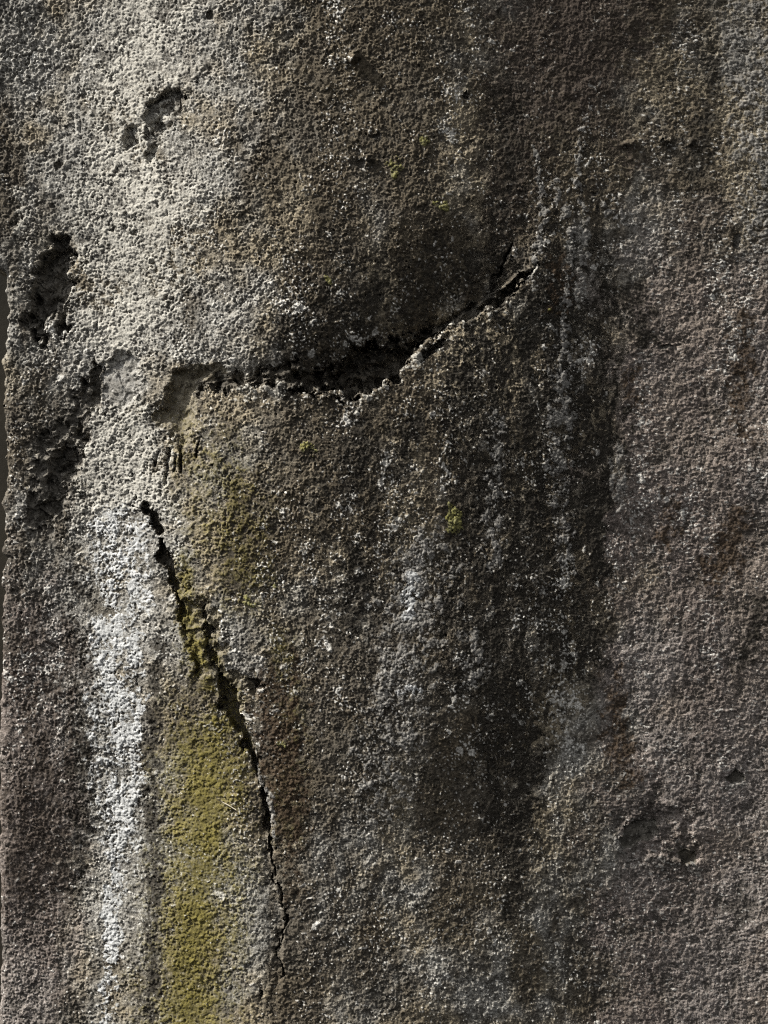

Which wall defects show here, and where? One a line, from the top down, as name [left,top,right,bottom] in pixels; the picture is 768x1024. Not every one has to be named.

spalling [18,233,80,350]
crack [193,242,540,415]
leakage [178,555,215,676]
crack [140,502,290,998]
leakage [176,716,224,1024]